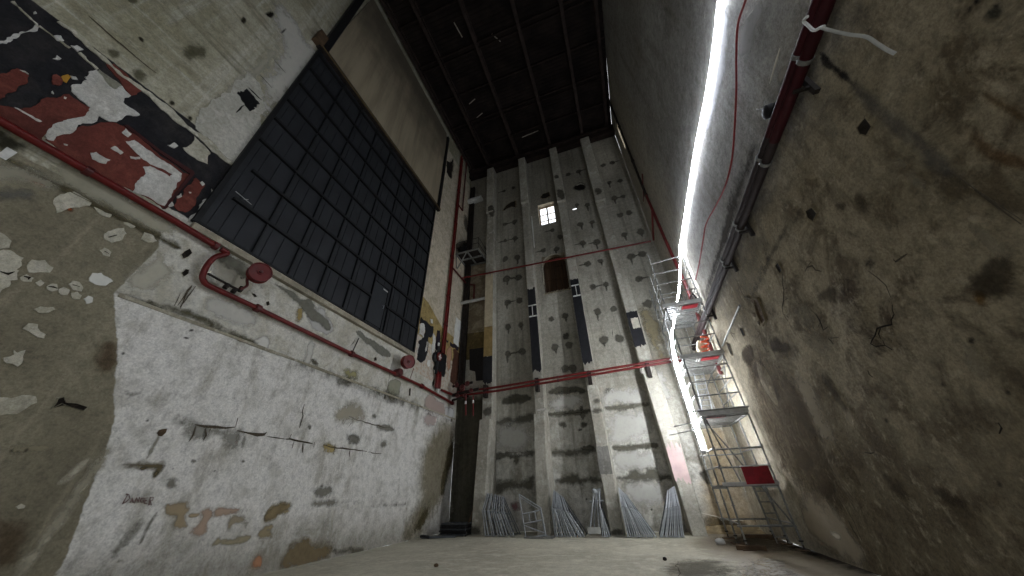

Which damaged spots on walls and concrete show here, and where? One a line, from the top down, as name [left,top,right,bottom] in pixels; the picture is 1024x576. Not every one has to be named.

peeling [0,1,213,221]
crack [869,254,907,350]
crack [189,406,390,457]
water stain [483,386,672,511]
peeling [165,502,289,546]